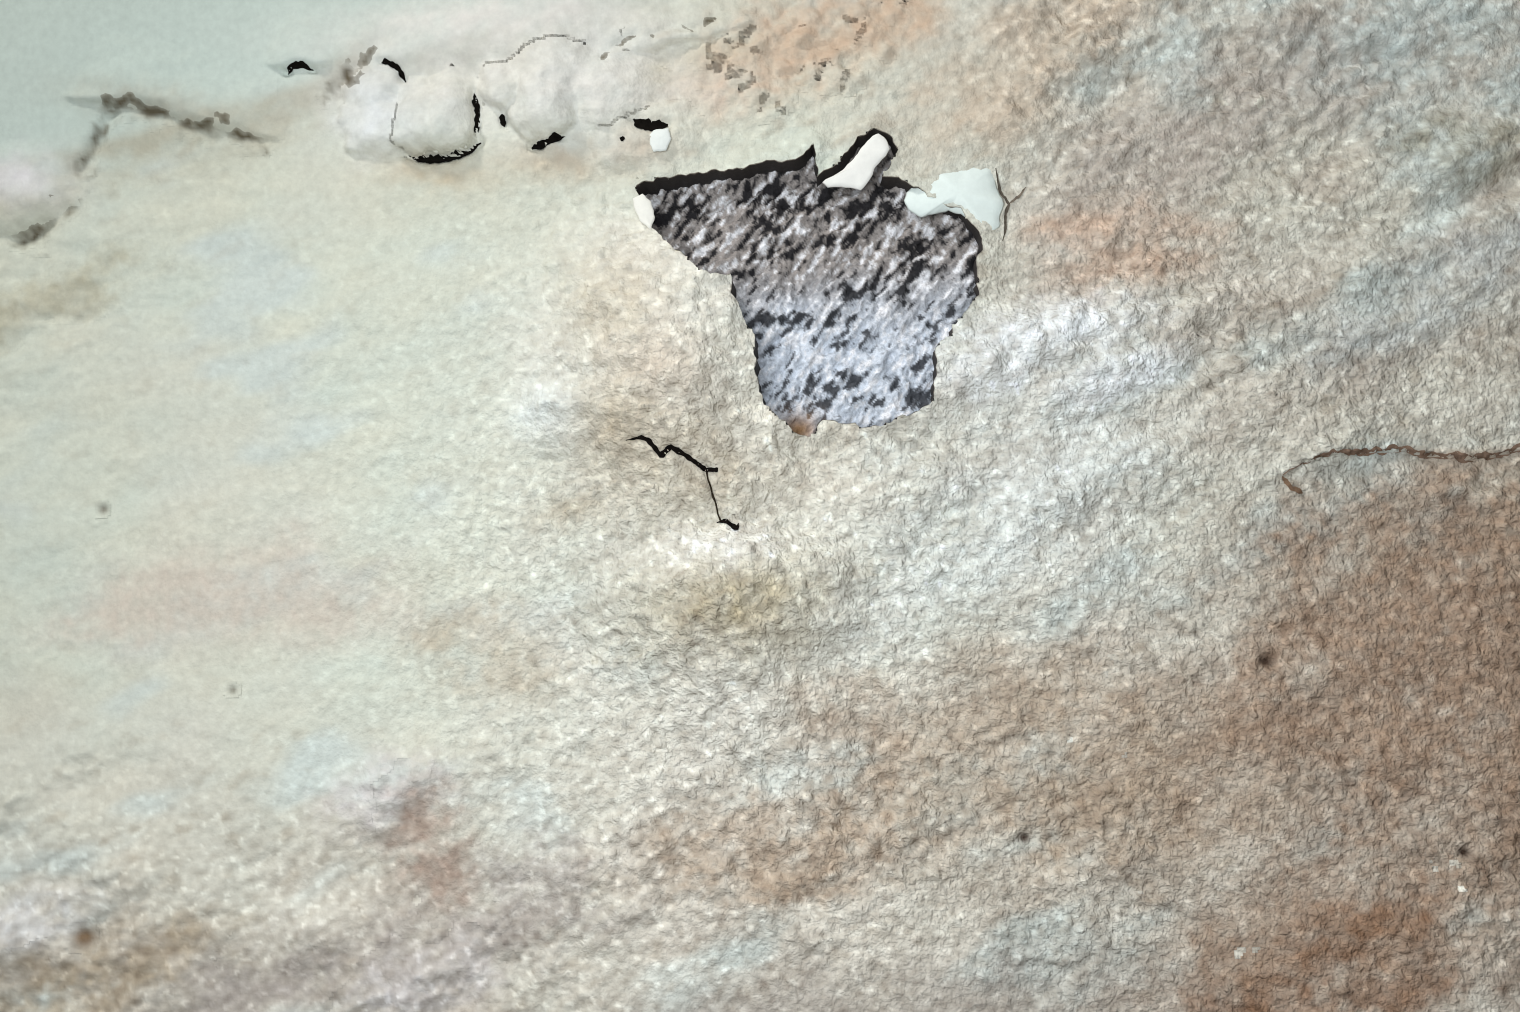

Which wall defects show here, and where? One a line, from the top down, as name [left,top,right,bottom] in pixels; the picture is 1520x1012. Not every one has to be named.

spalling [633,128,1004,437]
crack [626,435,739,530]
crack [1282,443,1520,494]